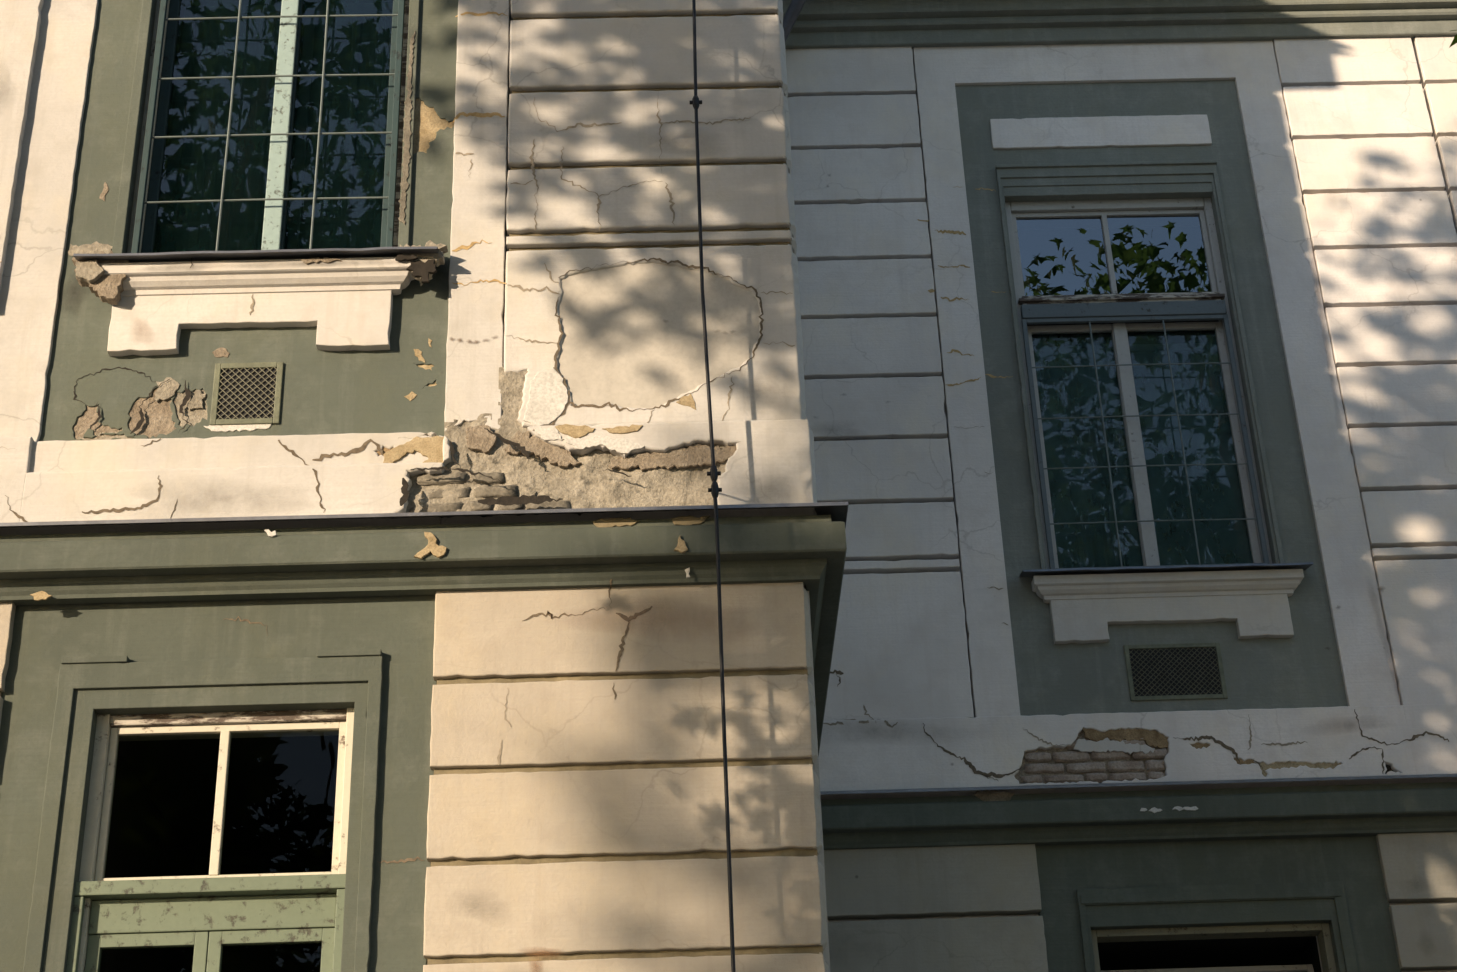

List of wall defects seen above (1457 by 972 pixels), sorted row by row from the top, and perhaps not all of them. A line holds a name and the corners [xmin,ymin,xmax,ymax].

spalling [68,241,130,305]
crack [451,91,795,426]
peeling [73,377,272,440]
crack [5,495,28,522]
crack [82,438,177,519]
crack [278,439,384,513]
spalling [376,367,737,553]
peeling [414,532,447,560]
crack [523,579,653,699]
flaking render [972,728,1168,801]
crack [1173,715,1307,773]
crack [1349,709,1449,773]